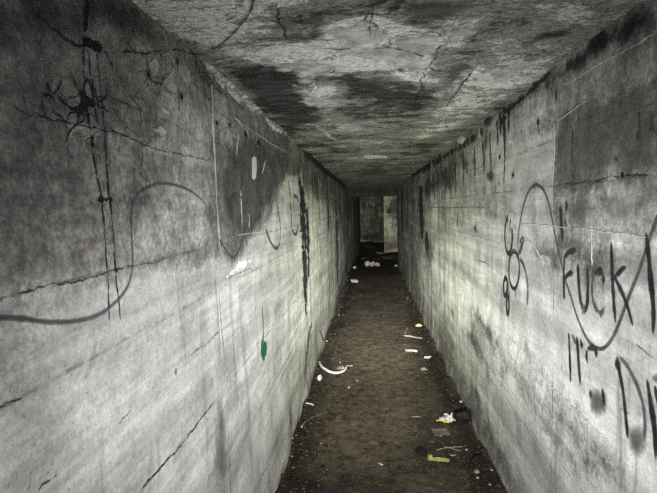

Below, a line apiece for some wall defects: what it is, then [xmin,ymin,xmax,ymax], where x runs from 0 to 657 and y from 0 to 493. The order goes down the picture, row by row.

crack [275,4,291,40]
water stain [409,3,470,21]
crack [11,37,221,178]
water stain [239,68,320,134]
crack [336,3,478,129]
water stain [394,106,510,256]
crack [0,261,161,301]
crack [142,405,212,489]